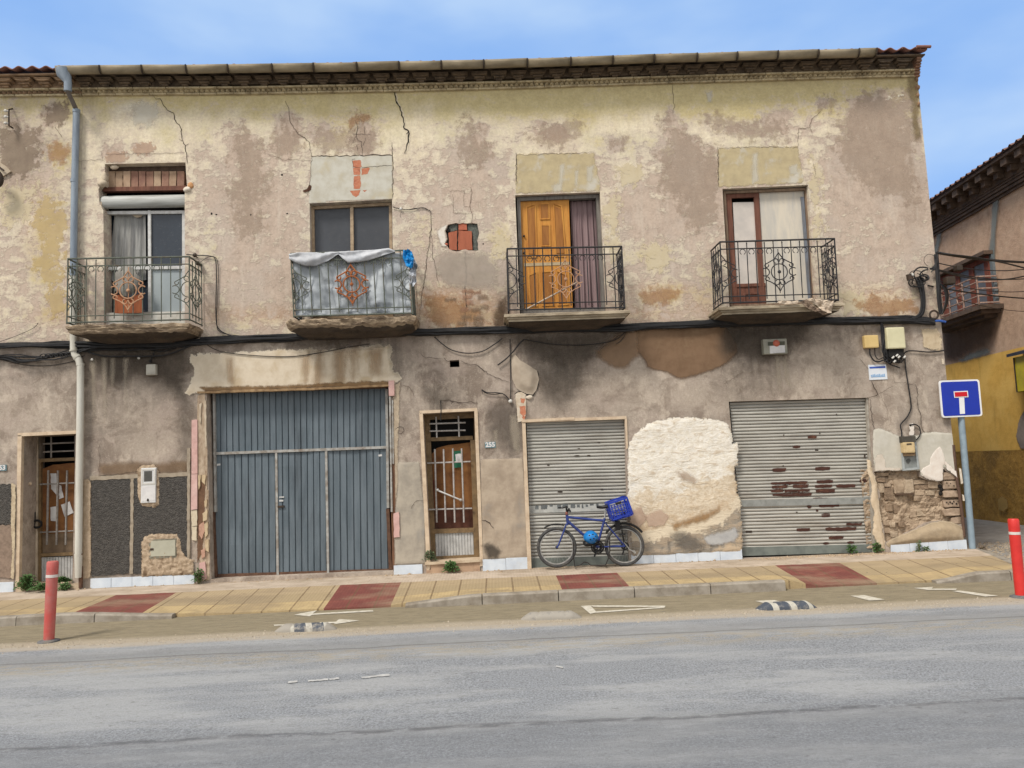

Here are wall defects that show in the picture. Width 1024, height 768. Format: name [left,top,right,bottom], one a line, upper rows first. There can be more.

crack [83,97,188,163]
spalling [350,160,370,197]
crack [274,92,473,316]
crack [717,112,820,180]
spalling [437,223,512,261]
corrosion [771,467,867,545]
spalling [860,454,961,552]